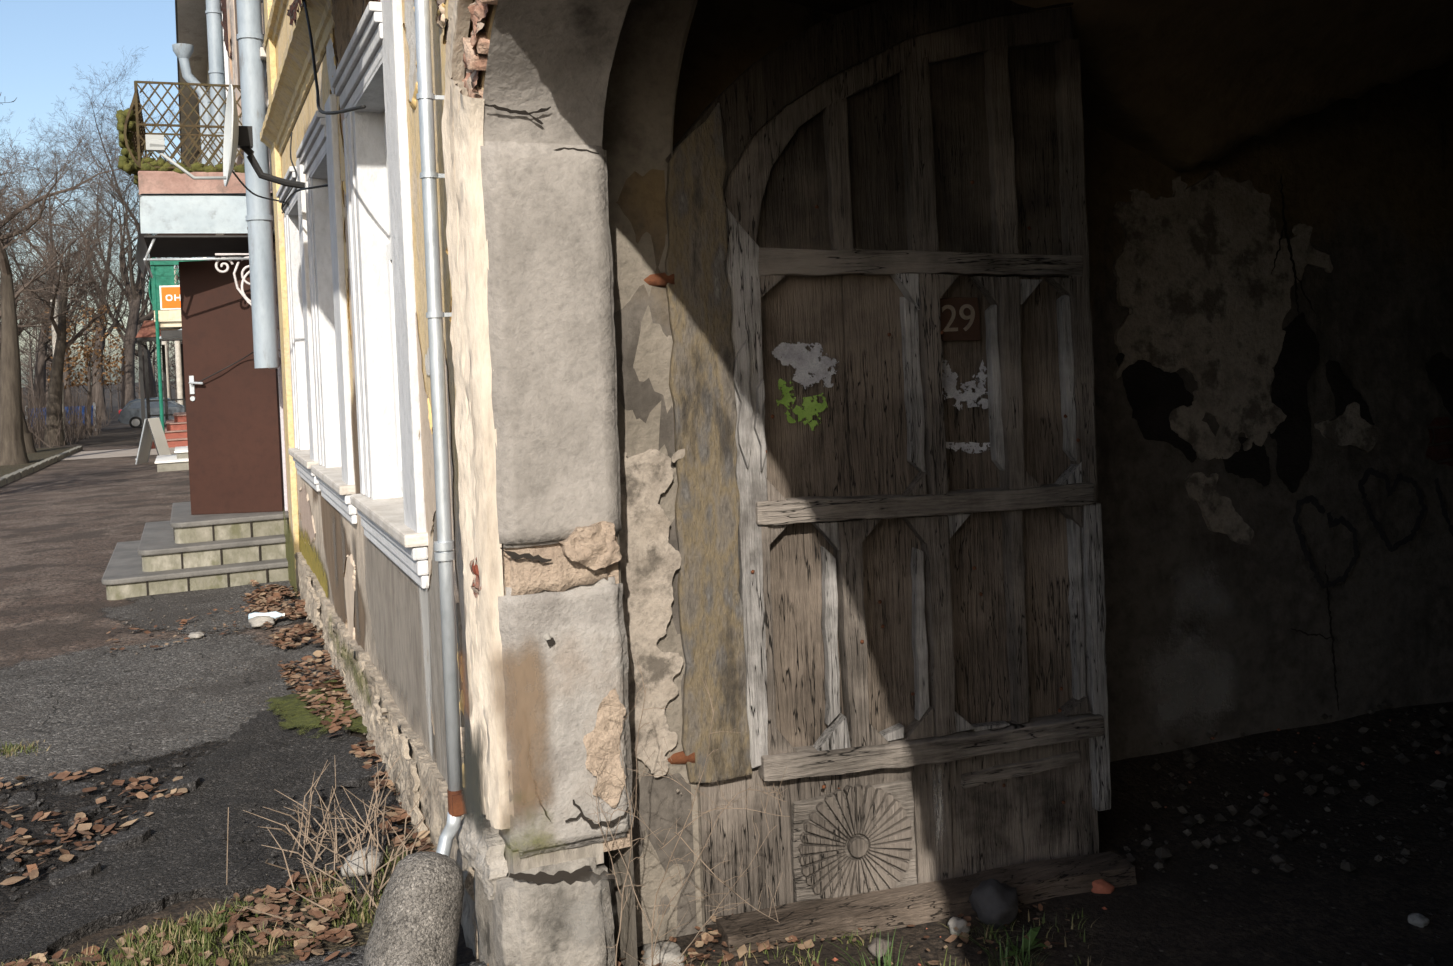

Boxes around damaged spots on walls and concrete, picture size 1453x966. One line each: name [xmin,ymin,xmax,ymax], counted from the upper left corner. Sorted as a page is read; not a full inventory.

spalling [325,0,380,152]
peeling [403,0,418,110]
spalling [435,0,498,99]
crack [484,104,599,154]
flaking render [342,180,357,410]
flaking render [1112,170,1381,545]
peeling [415,313,481,614]
flaking render [304,554,428,833]
peeling [559,449,685,808]
crack [509,865,615,885]
crack [539,799,629,829]